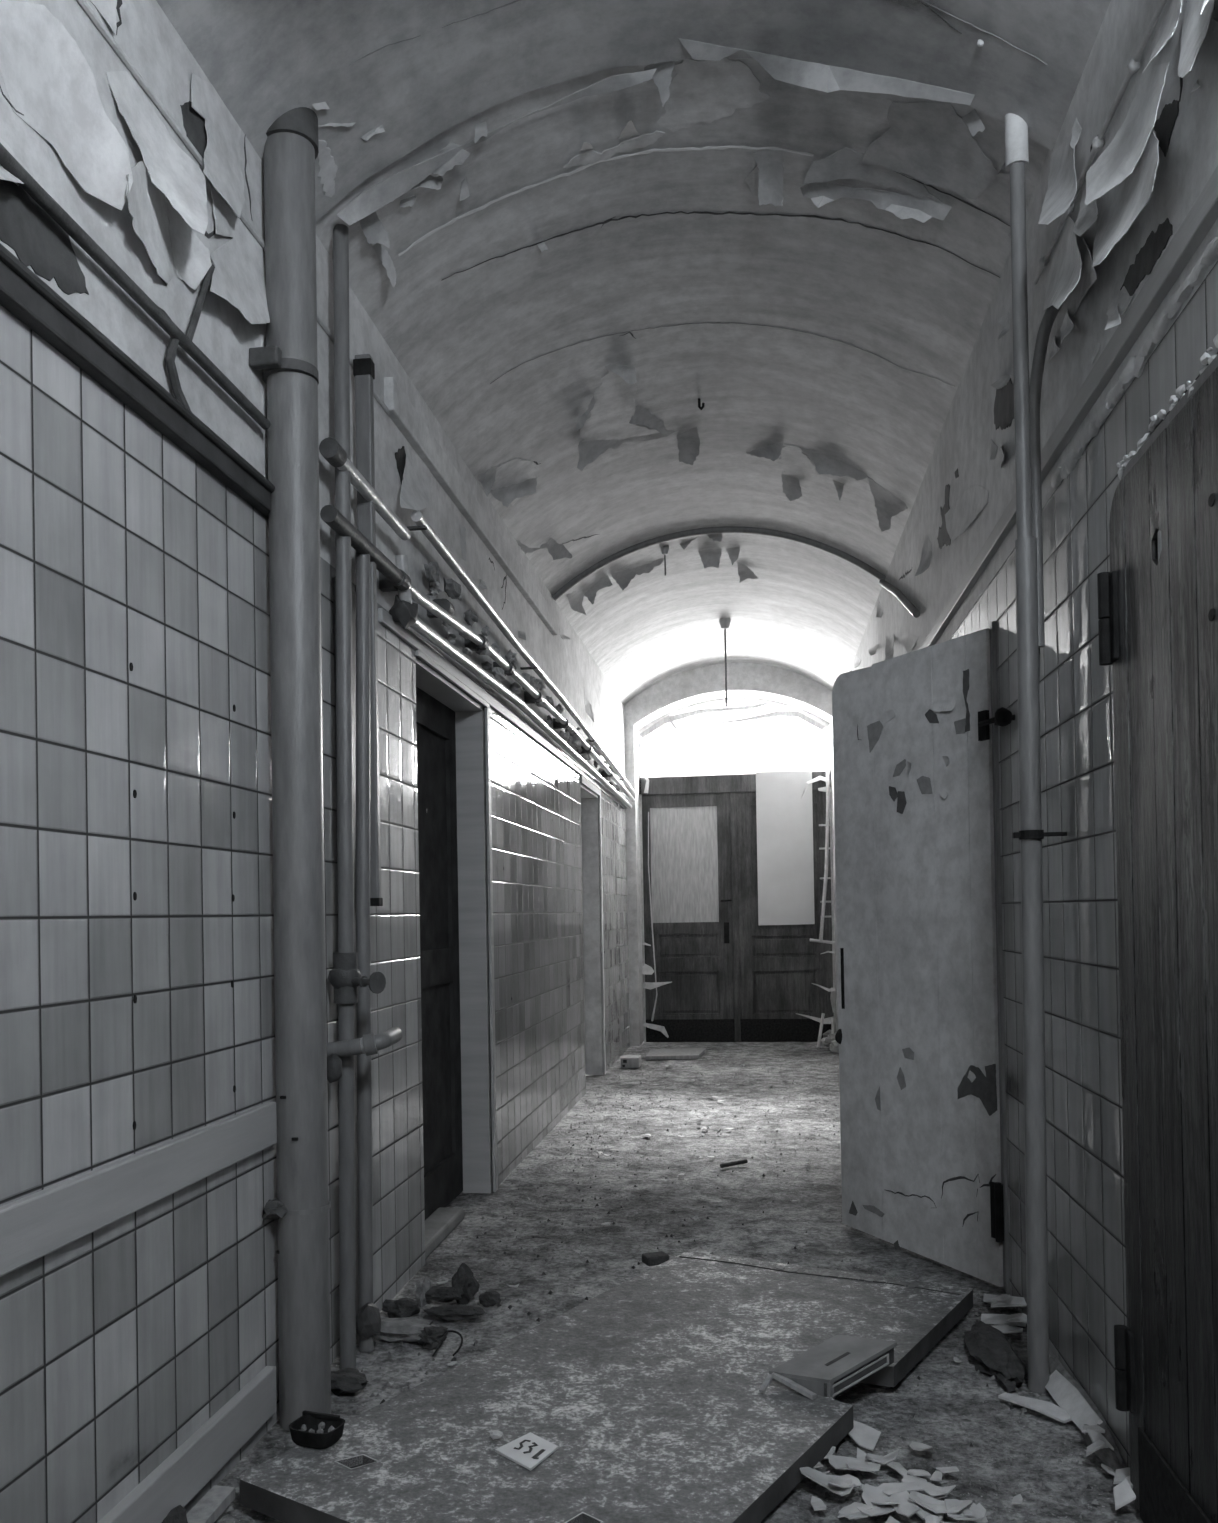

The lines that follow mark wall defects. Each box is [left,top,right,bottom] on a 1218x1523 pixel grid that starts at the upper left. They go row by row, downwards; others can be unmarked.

peeling [0,137,89,295]
peeling [106,71,270,324]
peeling [312,38,1009,291]
peeling [1038,0,1218,363]
spalling [1051,232,1218,489]
peeling [576,364,700,471]
spalling [990,375,1014,468]
peeling [395,446,431,511]
peeling [746,442,908,532]
peeling [517,534,599,560]
peeling [567,558,664,615]
peeling [680,534,759,583]